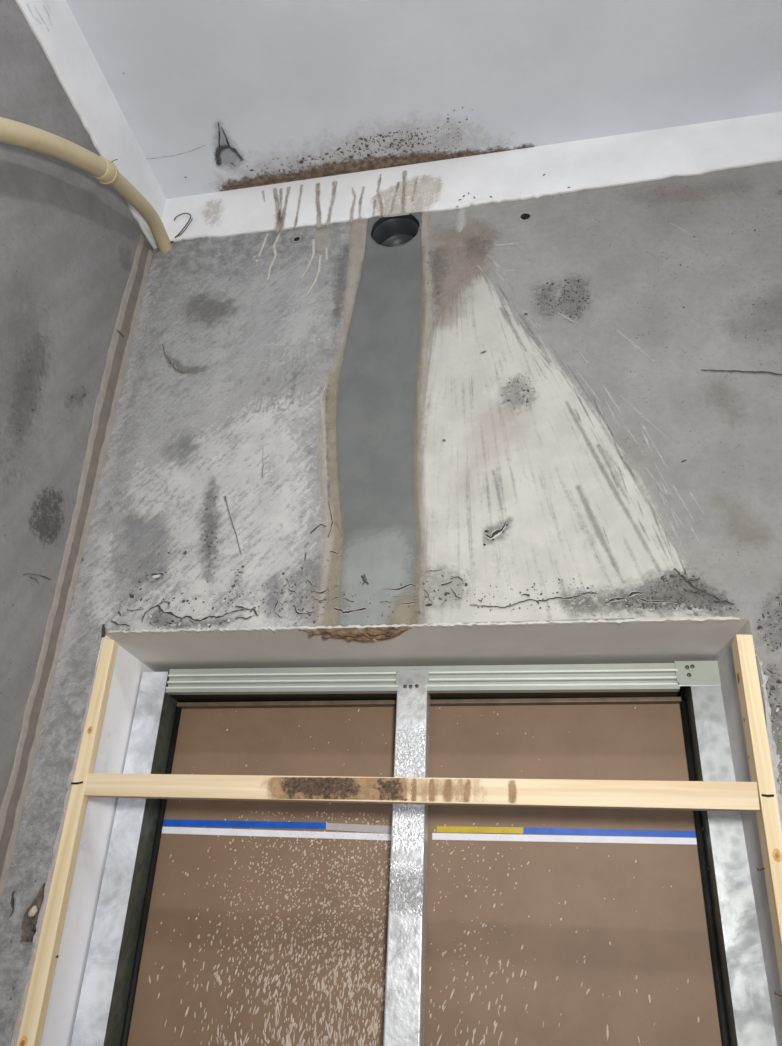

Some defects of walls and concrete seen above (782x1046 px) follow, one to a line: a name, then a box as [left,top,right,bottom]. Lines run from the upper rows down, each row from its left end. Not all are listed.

spalling [524,277,590,320]
crack [701,369,782,377]
water stain [41,107,715,733]
water stain [30,491,64,541]
crack [101,495,735,638]
flaking render [107,496,740,642]
flaking render [757,594,782,651]
flaking render [764,665,782,783]
spalling [9,884,45,944]